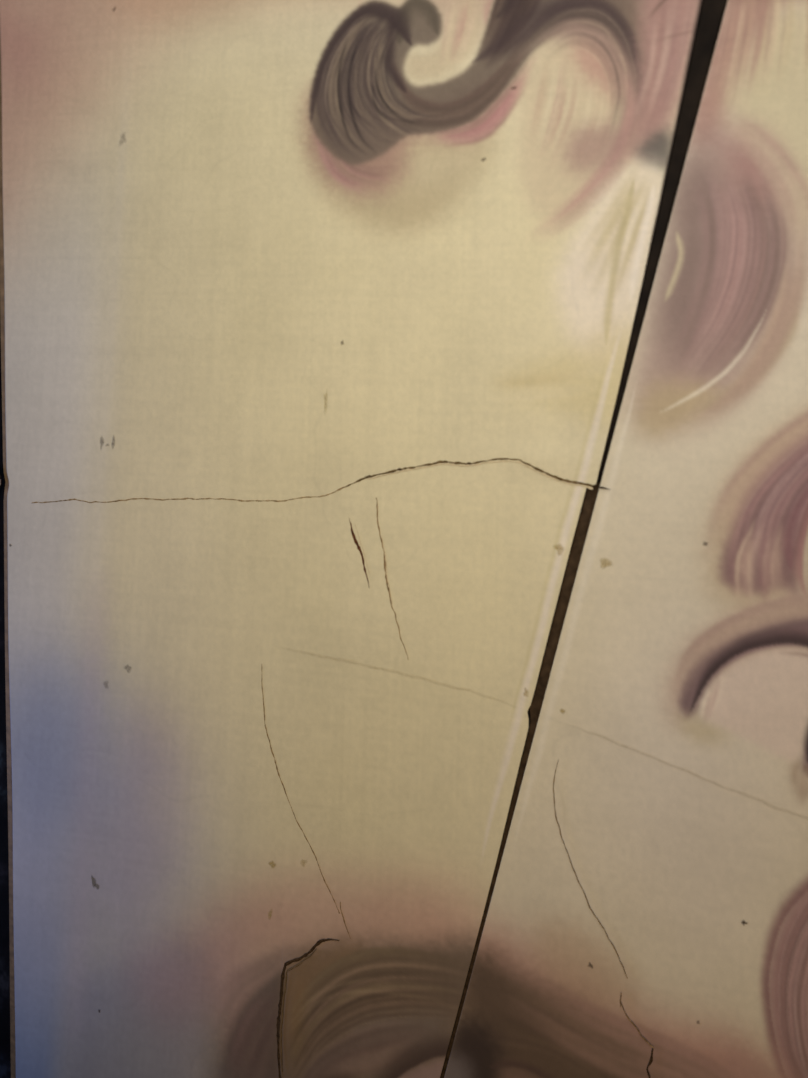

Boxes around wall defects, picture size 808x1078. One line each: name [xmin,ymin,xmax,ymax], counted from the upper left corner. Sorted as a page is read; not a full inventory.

crack [32,458,610,654]
crack [262,687,350,937]
crack [553,763,654,1078]